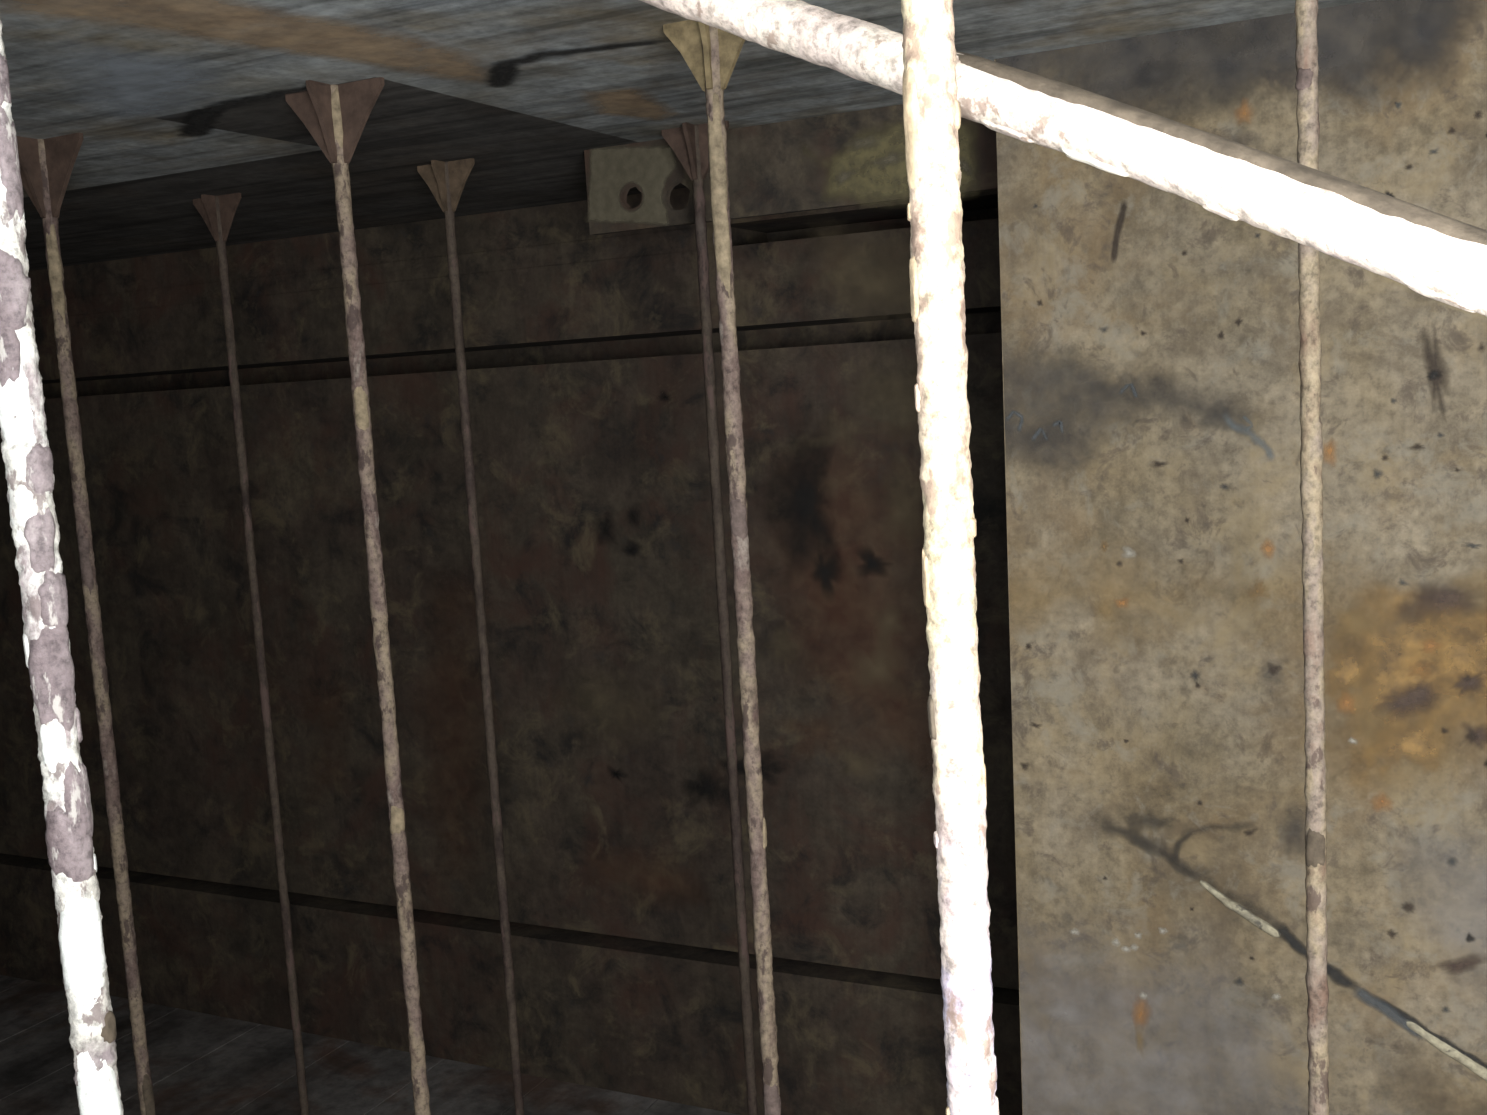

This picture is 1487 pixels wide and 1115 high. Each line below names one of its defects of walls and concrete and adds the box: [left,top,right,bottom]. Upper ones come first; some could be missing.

corrosion [1330,588,1487,778]
crack [1200,880,1487,1082]